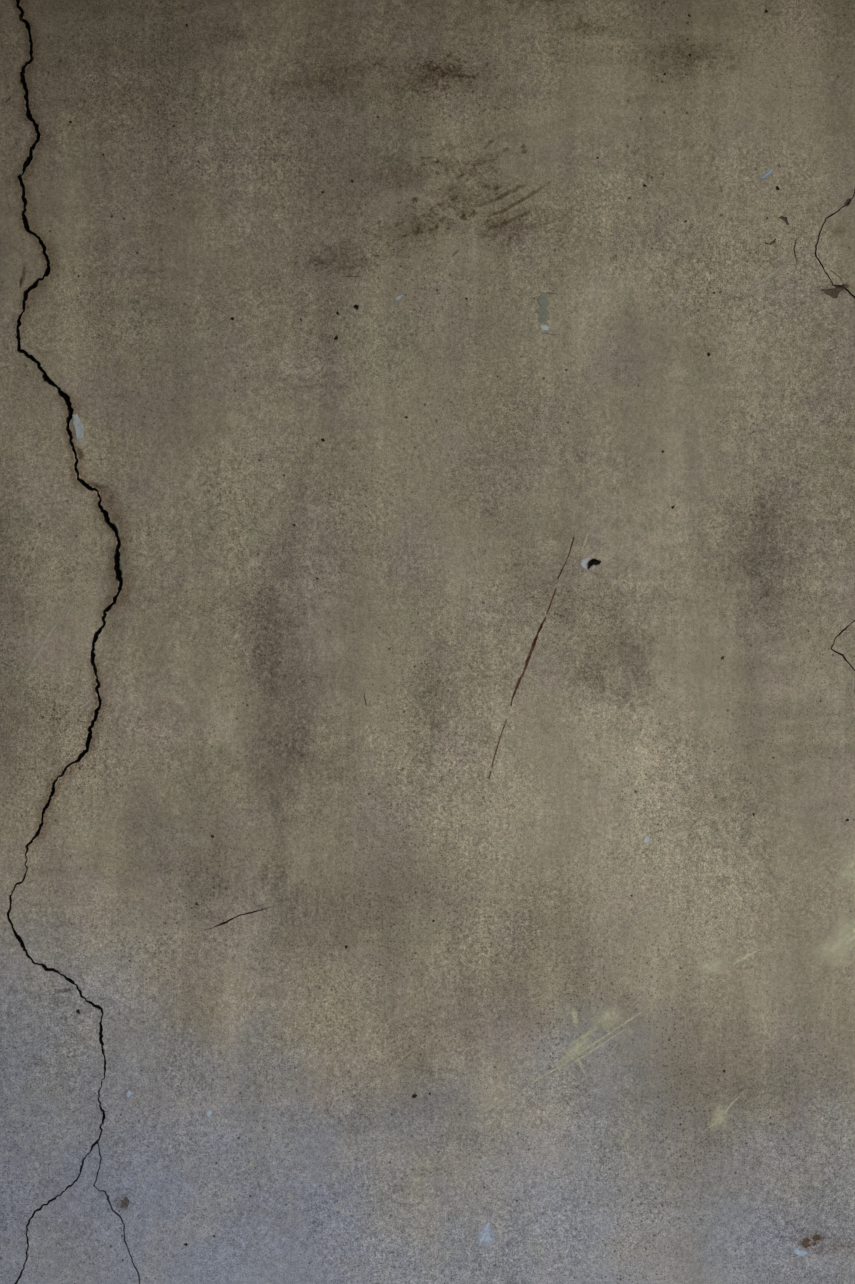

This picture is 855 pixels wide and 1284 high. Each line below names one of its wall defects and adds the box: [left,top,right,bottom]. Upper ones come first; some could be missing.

crack [793,189,855,299]
crack [7,0,140,1284]
crack [831,620,855,671]